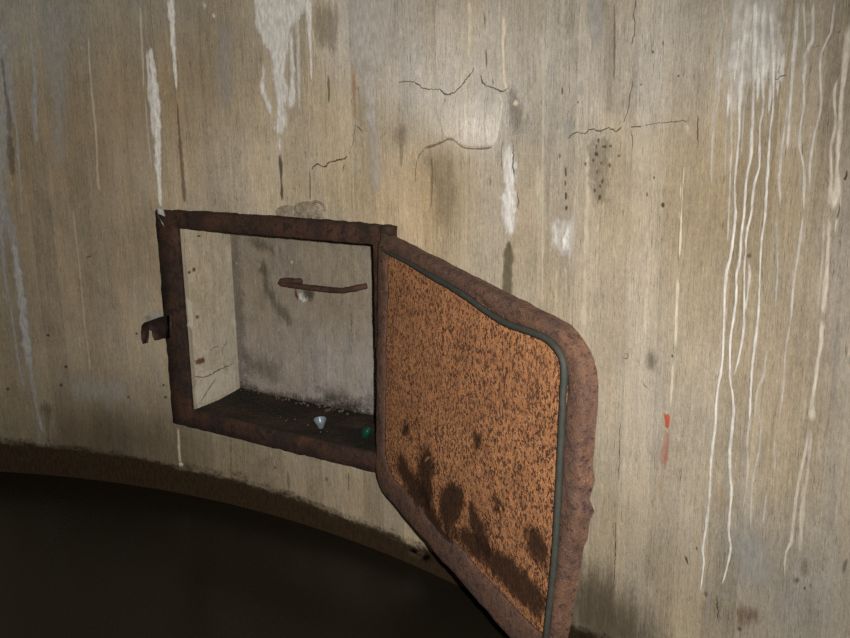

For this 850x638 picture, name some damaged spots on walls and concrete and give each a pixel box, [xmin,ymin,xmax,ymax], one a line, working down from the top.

water stain [146,48,164,225]
water stain [255,0,312,198]
crack [312,125,362,169]
crack [399,68,508,95]
water stain [501,145,517,294]
crack [569,83,699,143]
water stain [791,220,803,314]
water stain [778,5,834,207]
water stain [809,26,850,419]
water stain [0,430,469,591]
water stain [784,431,812,573]
water stain [568,625,597,638]